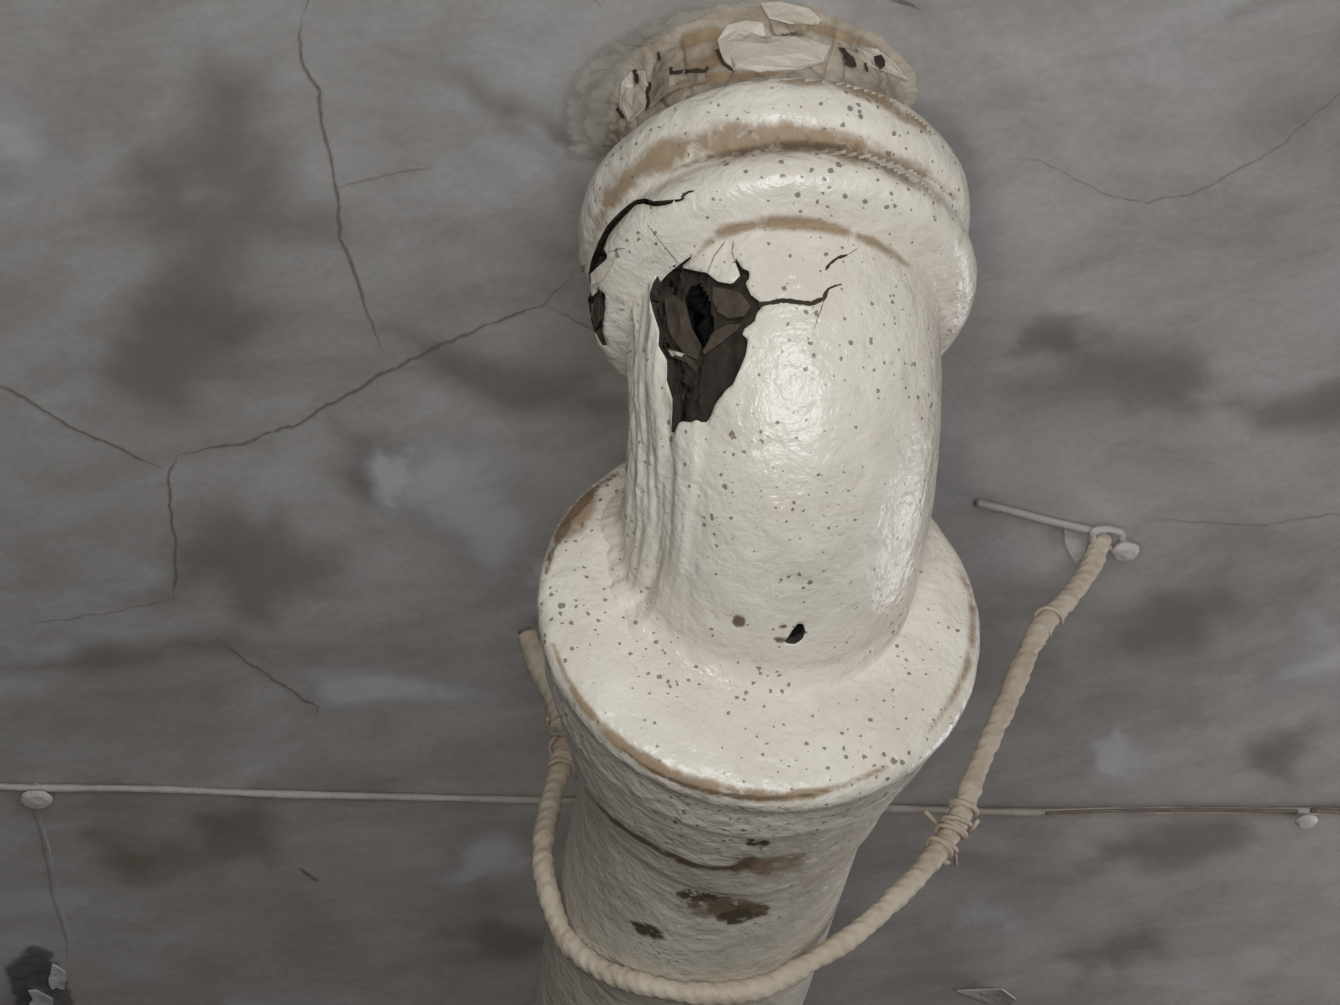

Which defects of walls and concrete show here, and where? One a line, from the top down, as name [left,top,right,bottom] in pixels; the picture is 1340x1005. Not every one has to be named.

peeling [620,69,707,122]
peeling [718,1,830,72]
peeling [855,46,908,81]
crack [299,33,375,331]
crack [206,287,561,449]
peeling [668,348,698,373]
crack [3,387,139,459]
crack [168,464,178,588]